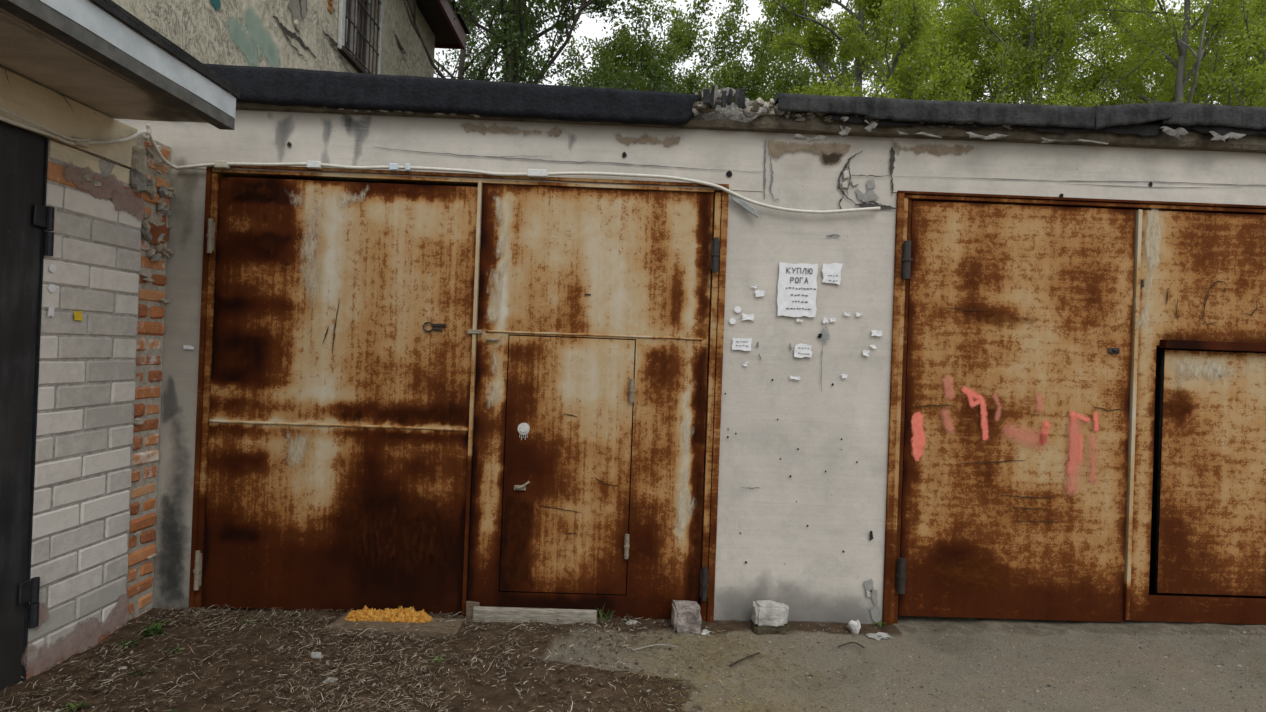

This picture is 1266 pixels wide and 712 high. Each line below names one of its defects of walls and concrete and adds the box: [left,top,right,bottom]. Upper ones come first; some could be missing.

peeling [288,0,308,32]
damp [278,120,289,143]
damp [325,115,370,144]
peeling [64,142,176,283]
damp [163,378,178,420]
rust [694,348,708,444]
damp [161,476,184,600]
rust [686,473,705,601]